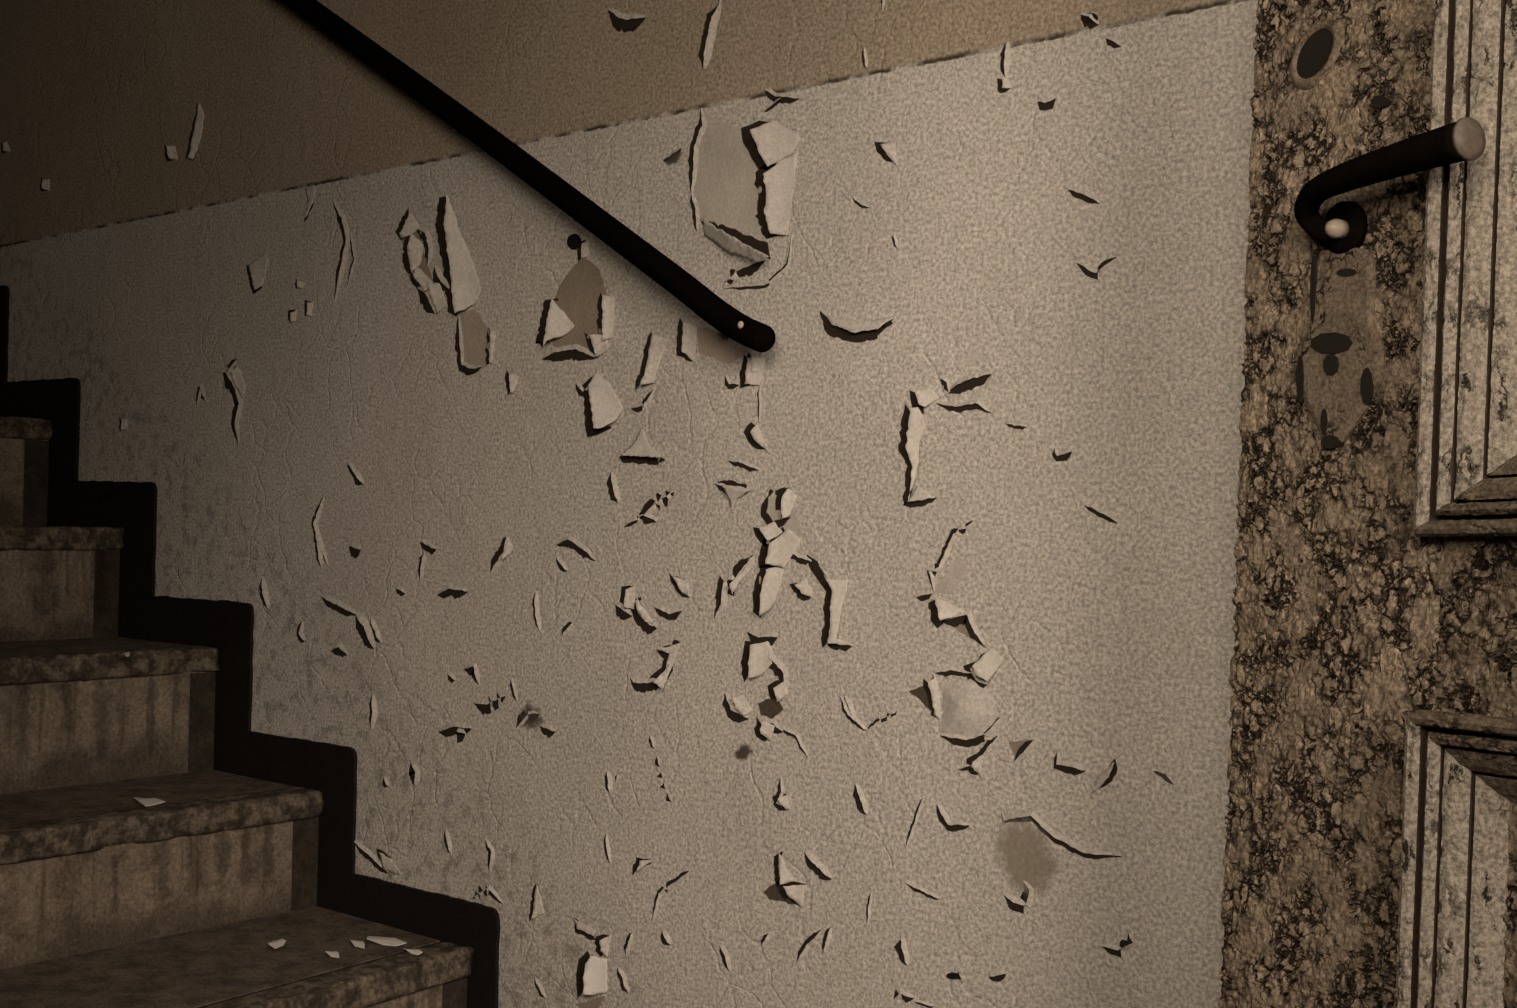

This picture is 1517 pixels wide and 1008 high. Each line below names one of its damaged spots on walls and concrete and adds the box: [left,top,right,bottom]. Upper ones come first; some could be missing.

peeling [695,88,801,290]
peeling [395,194,519,394]
peeling [535,234,623,437]
peeling [635,319,770,454]
peeling [615,573,690,693]
peeling [714,480,853,758]
peeling [909,520,1004,721]
peeling [772,778,792,811]
peeling [959,736,1034,781]
peeling [572,917,612,1008]
peeling [763,851,806,907]
peeling [1004,881,1034,914]